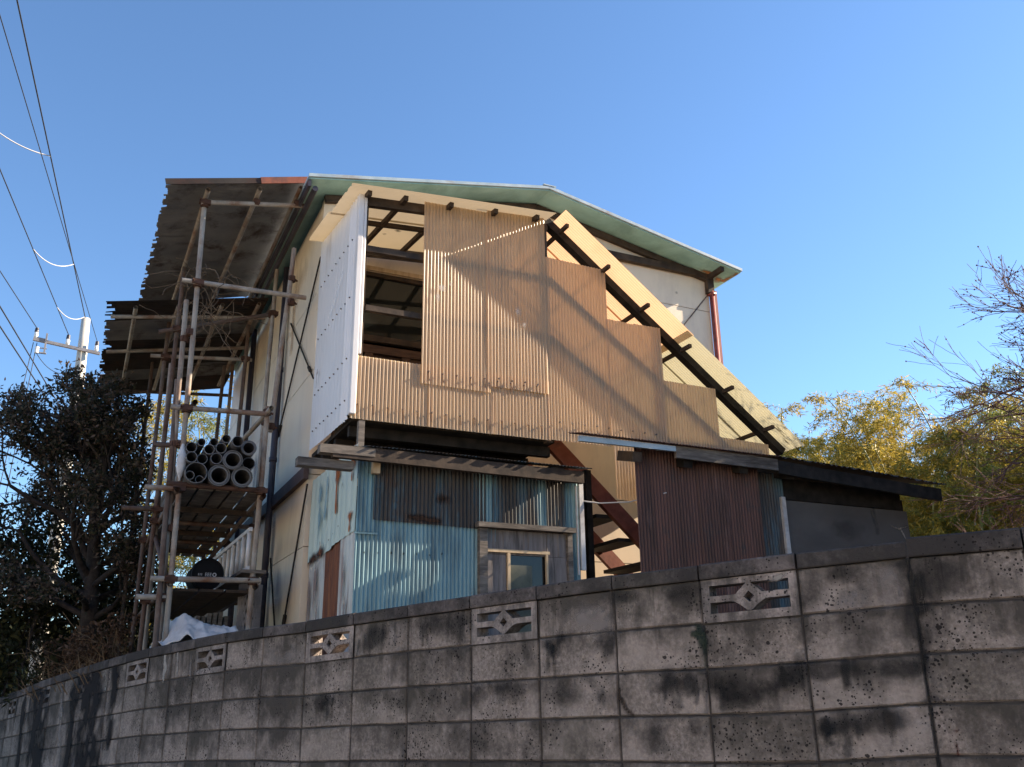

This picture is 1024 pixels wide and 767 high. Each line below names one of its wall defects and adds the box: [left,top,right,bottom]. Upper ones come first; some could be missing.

rust [335,460,356,532]
water stain [548,635,563,655]
water stain [576,609,614,654]
water stain [695,624,708,656]
water stain [659,672,695,692]
water stain [711,661,859,703]
water stain [15,696,26,767]
water stain [56,684,77,767]
water stain [105,666,119,748]
water stain [819,709,904,735]